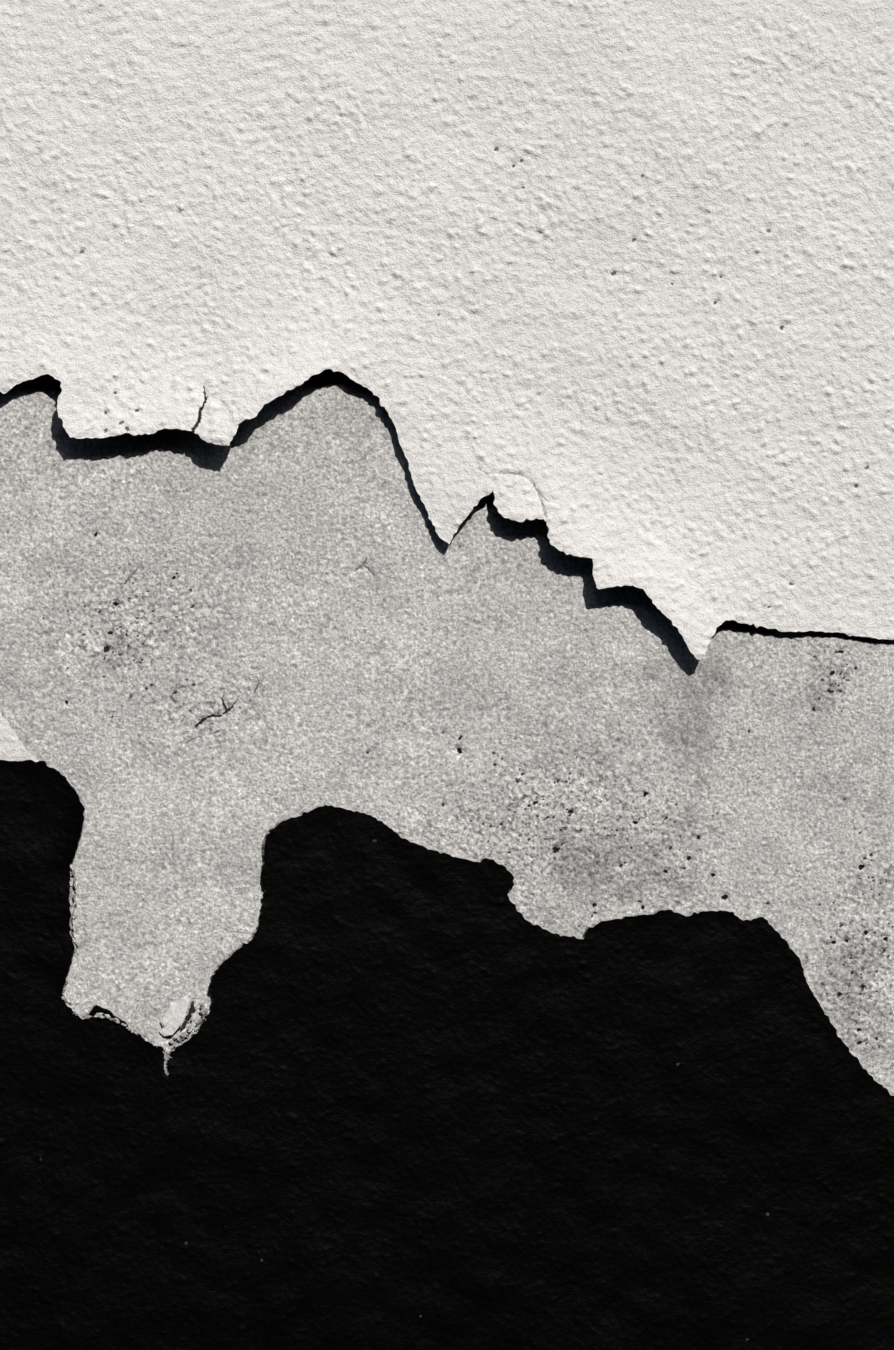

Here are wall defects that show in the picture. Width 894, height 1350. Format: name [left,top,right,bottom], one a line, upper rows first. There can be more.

crack [191,386,208,432]
peeling [0,369,894,1096]